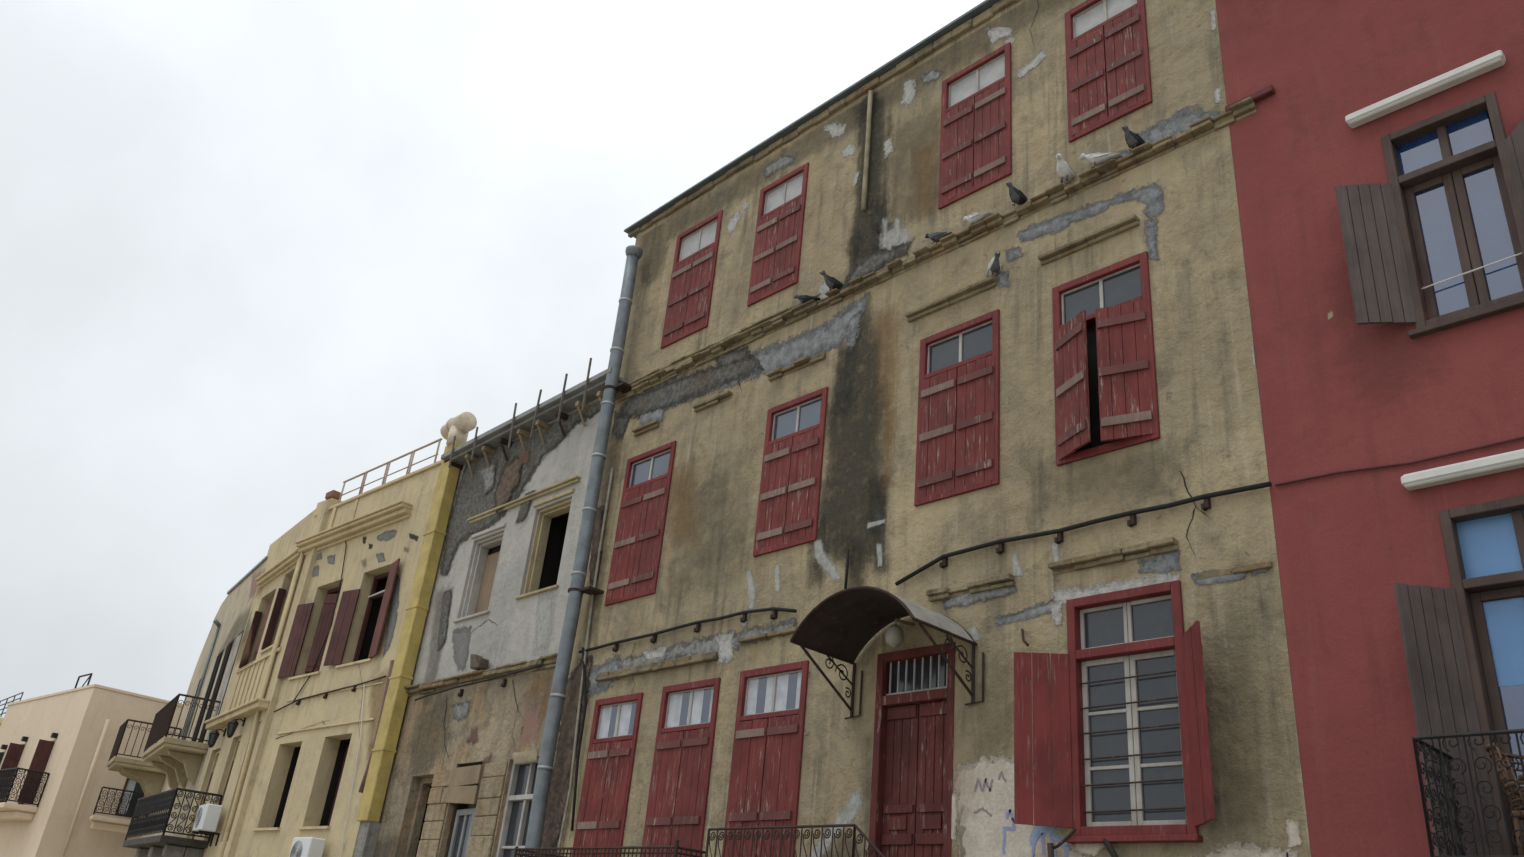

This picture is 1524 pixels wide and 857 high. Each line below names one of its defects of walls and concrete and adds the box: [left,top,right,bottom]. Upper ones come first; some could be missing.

water stain [850,92,938,273]
flaking render [995,180,1165,289]
water stain [819,282,830,299]
water stain [477,457,496,495]
flaking render [437,236,915,652]
water stain [812,307,886,587]
flaking render [467,727,491,817]
flaking render [511,749,537,764]
flaking render [539,617,797,857]
flaking render [951,752,1104,857]
flaking render [1189,819,1303,857]